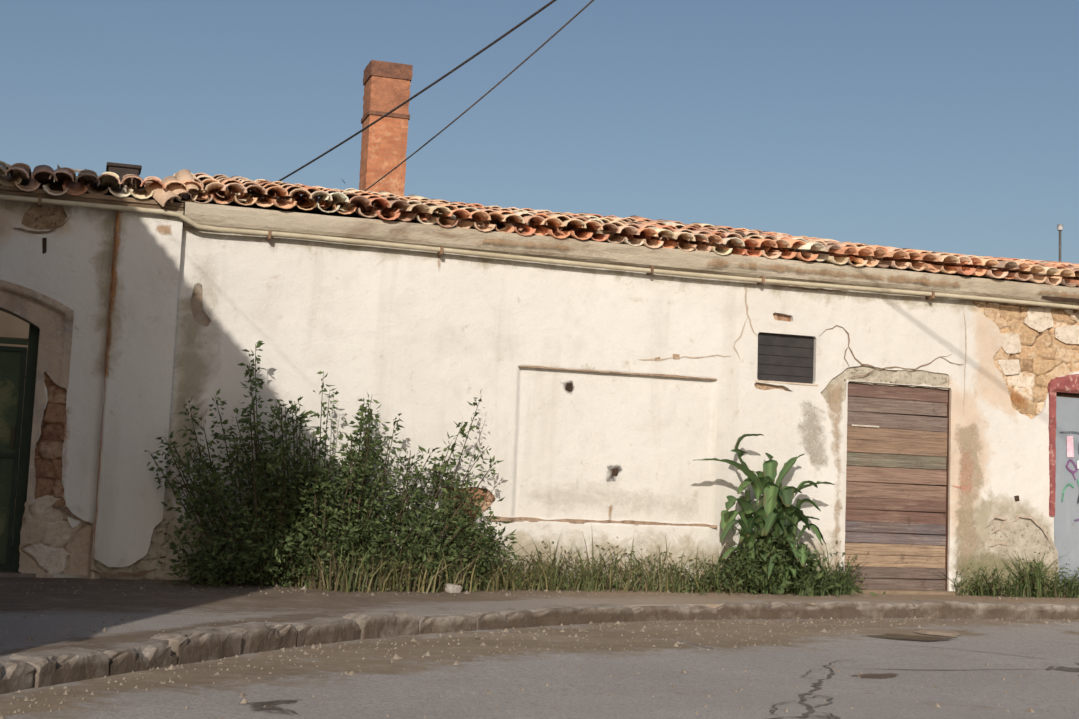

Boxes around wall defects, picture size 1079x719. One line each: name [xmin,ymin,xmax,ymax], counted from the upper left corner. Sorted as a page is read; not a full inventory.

flaking render [190,284,211,327]
crack [640,281,849,361]
flaking render [755,383,789,391]
flaking render [773,313,791,322]
damp [801,403,824,464]
peeling [707,259,960,287]
damp [829,385,842,465]
flaking render [821,365,950,403]
crack [822,305,967,409]
flaking render [971,291,1079,419]
flaking render [19,372,169,580]
damp [957,425,982,574]